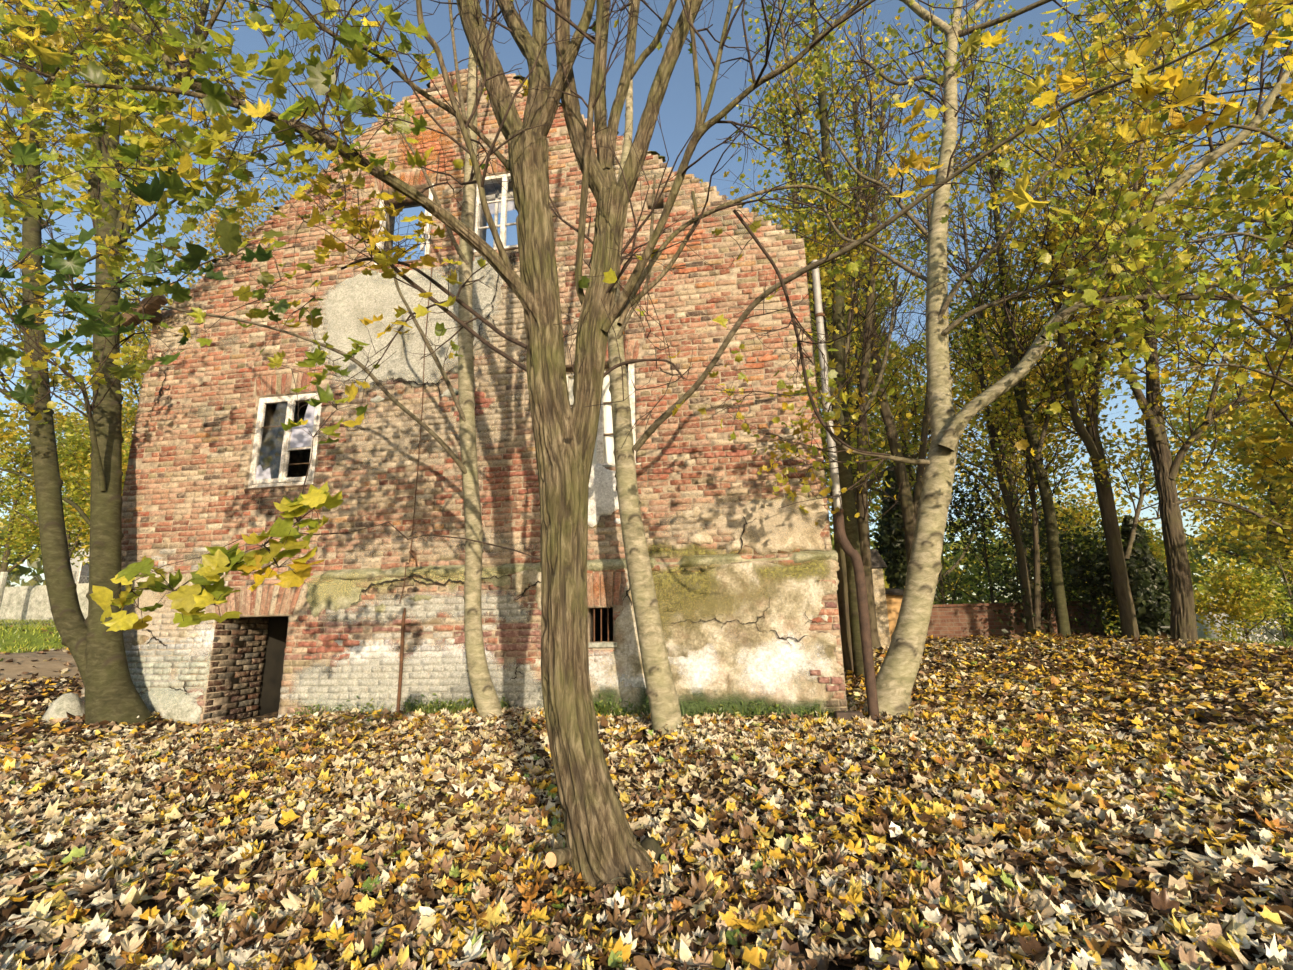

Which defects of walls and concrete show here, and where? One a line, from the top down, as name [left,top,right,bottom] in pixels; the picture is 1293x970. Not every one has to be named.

peeling [336,256,503,356]
peeling [335,358,492,422]
spalling [481,563,541,667]
peeling [589,568,646,715]
damp [655,588,760,638]
crack [671,598,824,647]
peeling [663,495,844,711]